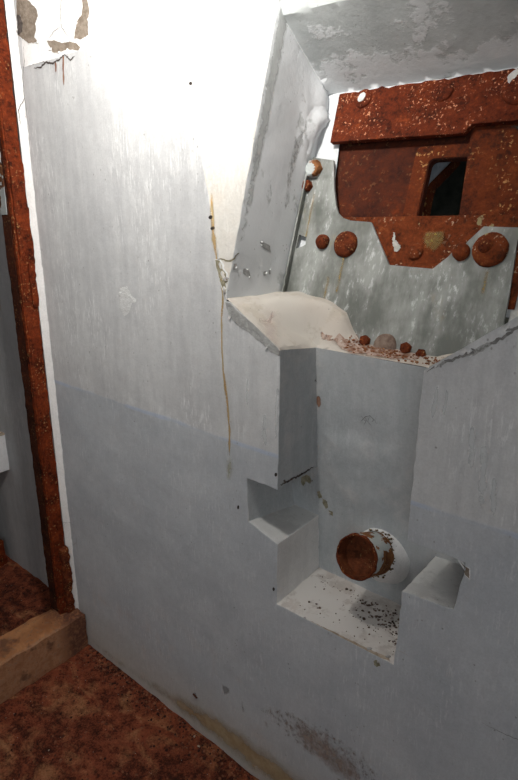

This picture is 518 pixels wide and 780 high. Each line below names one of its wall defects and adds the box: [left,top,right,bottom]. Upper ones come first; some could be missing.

spalling [16,0,90,54]
crack [18,8,75,123]
rust [321,332,417,360]
crack [427,326,518,372]
crack [281,467,313,486]
rust [336,533,378,581]
leakage [177,700,293,780]